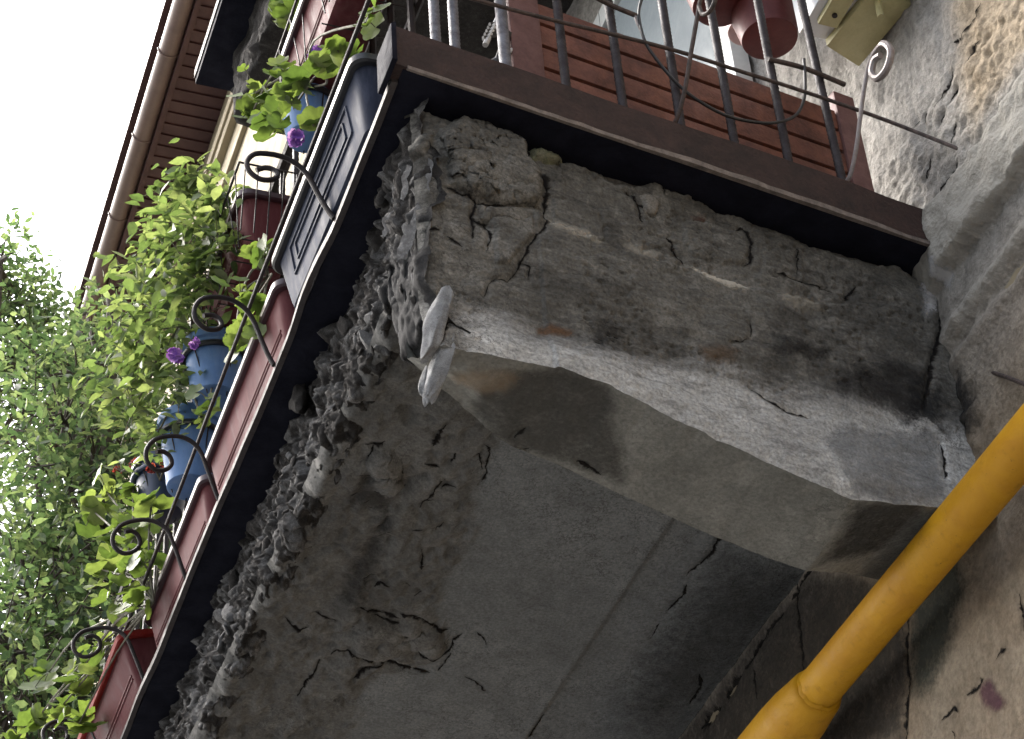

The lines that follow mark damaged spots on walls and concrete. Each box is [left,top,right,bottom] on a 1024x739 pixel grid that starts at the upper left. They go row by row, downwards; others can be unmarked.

crack [430,188,503,250]
crack [484,151,551,296]
crack [626,192,651,222]
crack [666,238,683,264]
crack [736,227,754,266]
damp [922,257,954,313]
spalling [154,99,471,739]
crack [751,390,808,419]
damp [837,365,941,423]
crack [366,441,385,457]
crack [286,444,491,696]
crack [652,538,721,636]